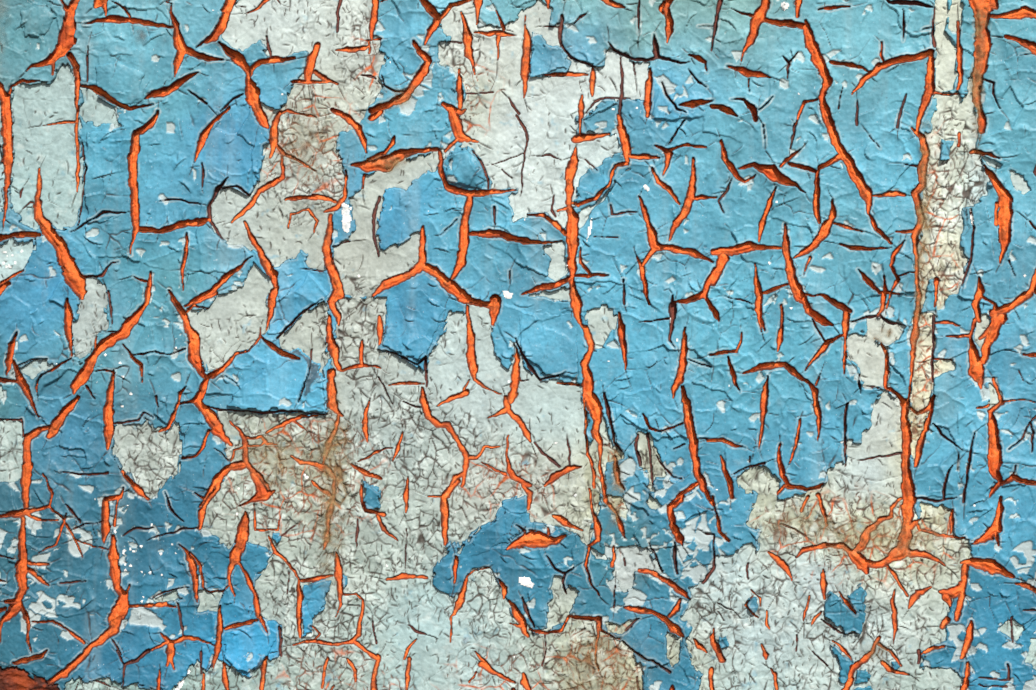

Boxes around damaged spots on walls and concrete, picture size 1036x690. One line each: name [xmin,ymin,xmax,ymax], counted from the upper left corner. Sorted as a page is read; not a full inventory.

peeling [0,64,124,282]
peeling [72,277,109,365]
crack [0,0,533,690]
peeling [173,0,666,690]
crack [330,0,1036,643]
peeling [666,0,990,690]
peeling [0,420,24,483]
peeling [113,418,203,499]
rust [0,666,60,690]
crack [498,579,671,674]
crack [693,628,725,690]
crack [832,635,910,690]